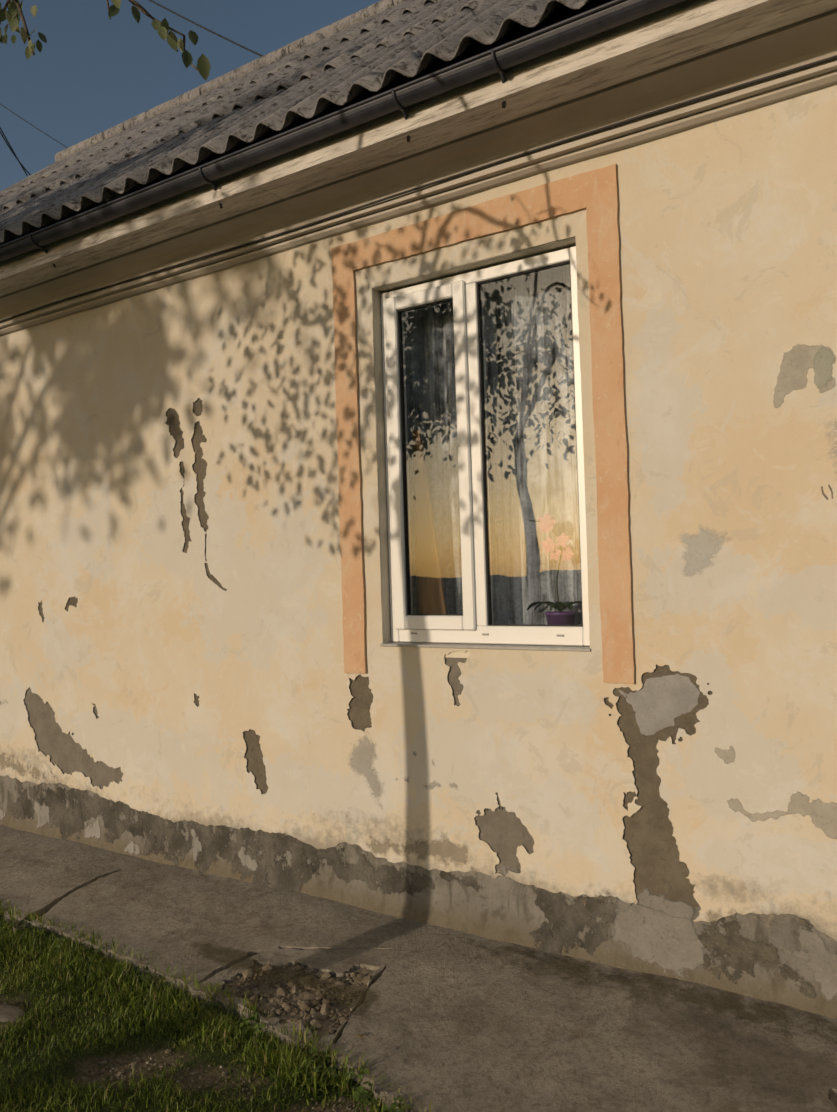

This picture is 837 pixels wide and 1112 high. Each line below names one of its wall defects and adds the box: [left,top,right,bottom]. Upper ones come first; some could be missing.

peeling [773,344,836,408]
spalling [165,398,227,591]
spalling [347,675,373,732]
spalling [444,651,467,706]
peeling [12,688,482,896]
spalling [474,792,534,875]
spalling [604,665,816,998]
peeling [728,792,837,839]
peeling [529,888,617,956]
spalling [220,959,380,1036]